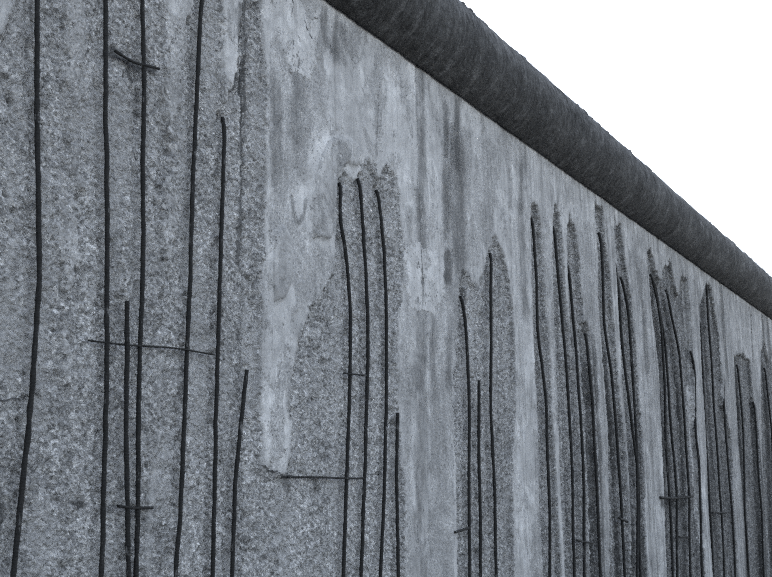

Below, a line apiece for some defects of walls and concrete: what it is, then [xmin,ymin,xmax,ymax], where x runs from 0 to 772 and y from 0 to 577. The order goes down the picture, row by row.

spalling [0,0,446,577]
spalling [452,235,516,577]
spalling [530,201,647,577]
spalling [647,249,772,577]